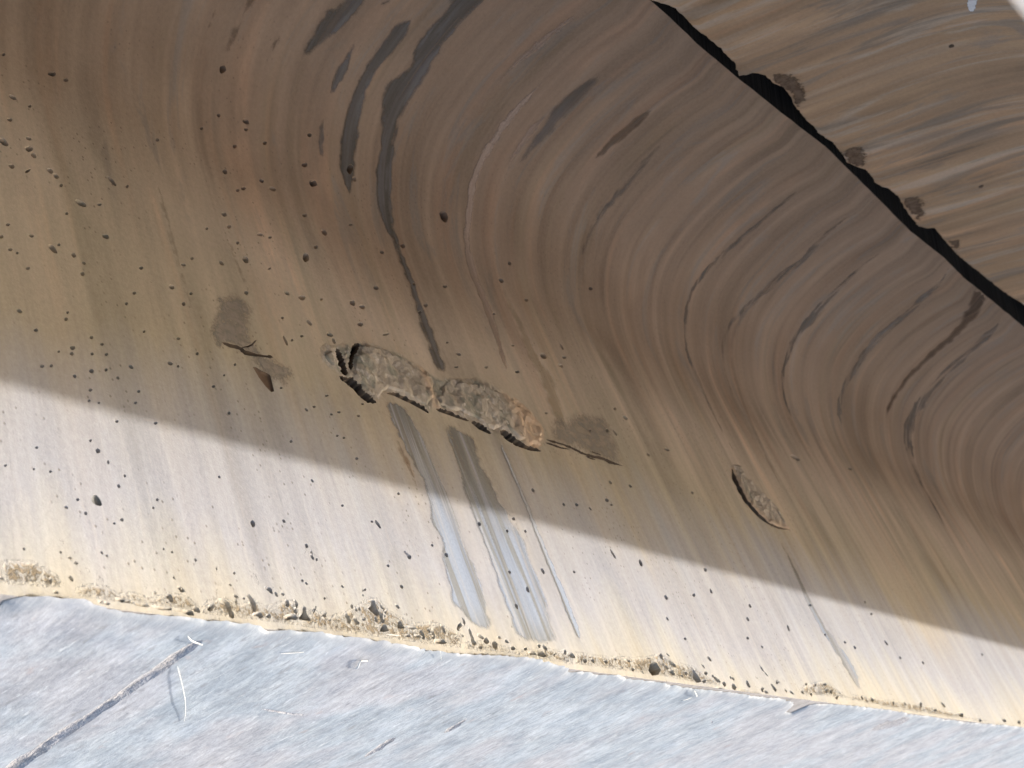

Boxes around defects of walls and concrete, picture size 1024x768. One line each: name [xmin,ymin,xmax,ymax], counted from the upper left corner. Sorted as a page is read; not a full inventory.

damp [305,0,364,53]
damp [332,50,352,91]
damp [340,21,410,193]
damp [376,0,483,370]
crack [650,0,1024,327]
crack [223,340,274,359]
spalling [253,367,274,392]
spalling [319,340,546,452]
damp [388,403,490,627]
damp [448,427,554,642]
damp [502,446,580,638]